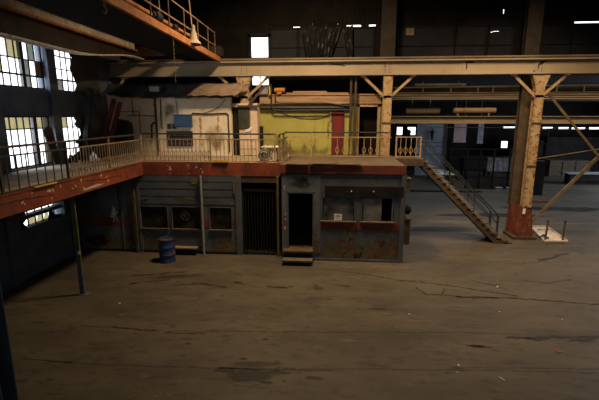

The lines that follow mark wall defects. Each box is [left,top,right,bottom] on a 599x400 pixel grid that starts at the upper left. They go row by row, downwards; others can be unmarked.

crack [327,269,599,305]